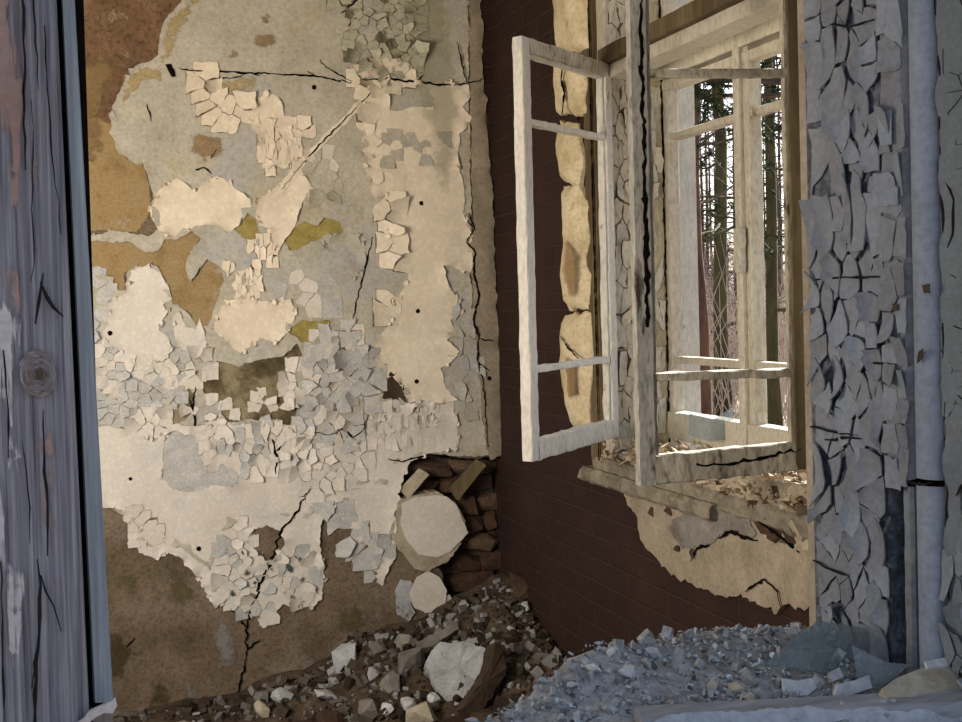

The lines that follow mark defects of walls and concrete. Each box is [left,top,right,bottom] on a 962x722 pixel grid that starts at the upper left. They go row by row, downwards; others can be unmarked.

crack [180,43,485,189]
crack [937,53,962,248]
peeling [84,0,501,628]
peeling [648,0,924,671]
peeling [922,0,962,689]
crack [942,323,962,359]
crack [230,493,307,693]
crack [906,481,962,526]